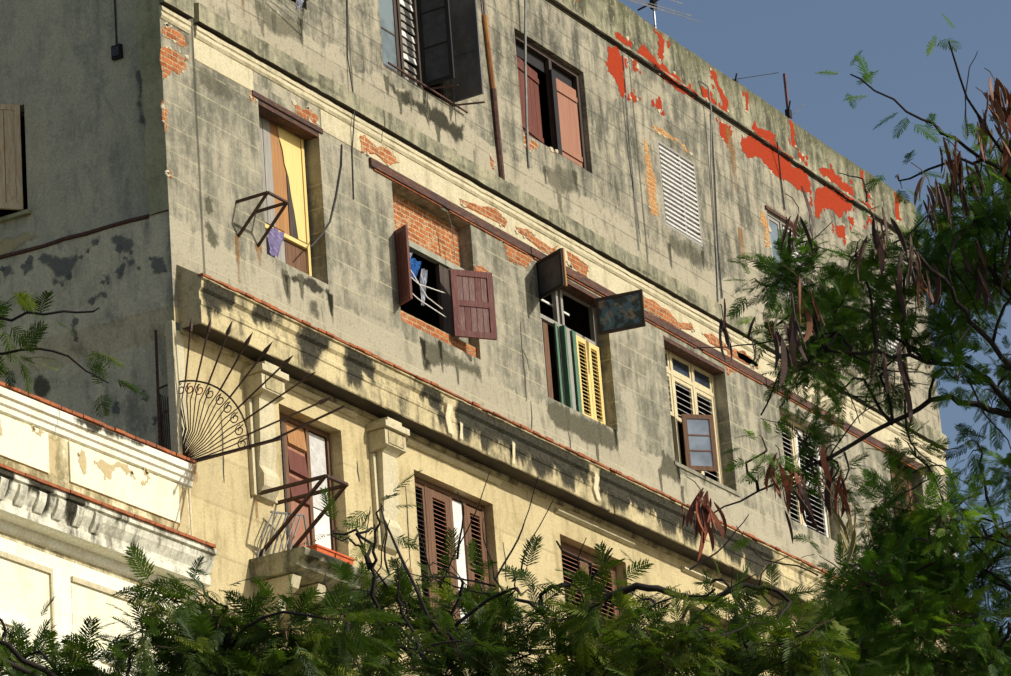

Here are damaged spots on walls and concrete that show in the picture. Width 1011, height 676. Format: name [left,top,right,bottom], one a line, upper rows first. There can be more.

flaking render [160,22,189,80]
damp [384,75,465,142]
flaking render [359,135,399,167]
peeling [605,28,876,249]
damp [202,281,235,319]
damp [282,269,334,317]
damp [296,328,328,369]
damp [344,349,375,387]
damp [420,337,481,384]
peeling [31,425,58,477]
peeling [77,450,150,486]
damp [406,385,699,548]